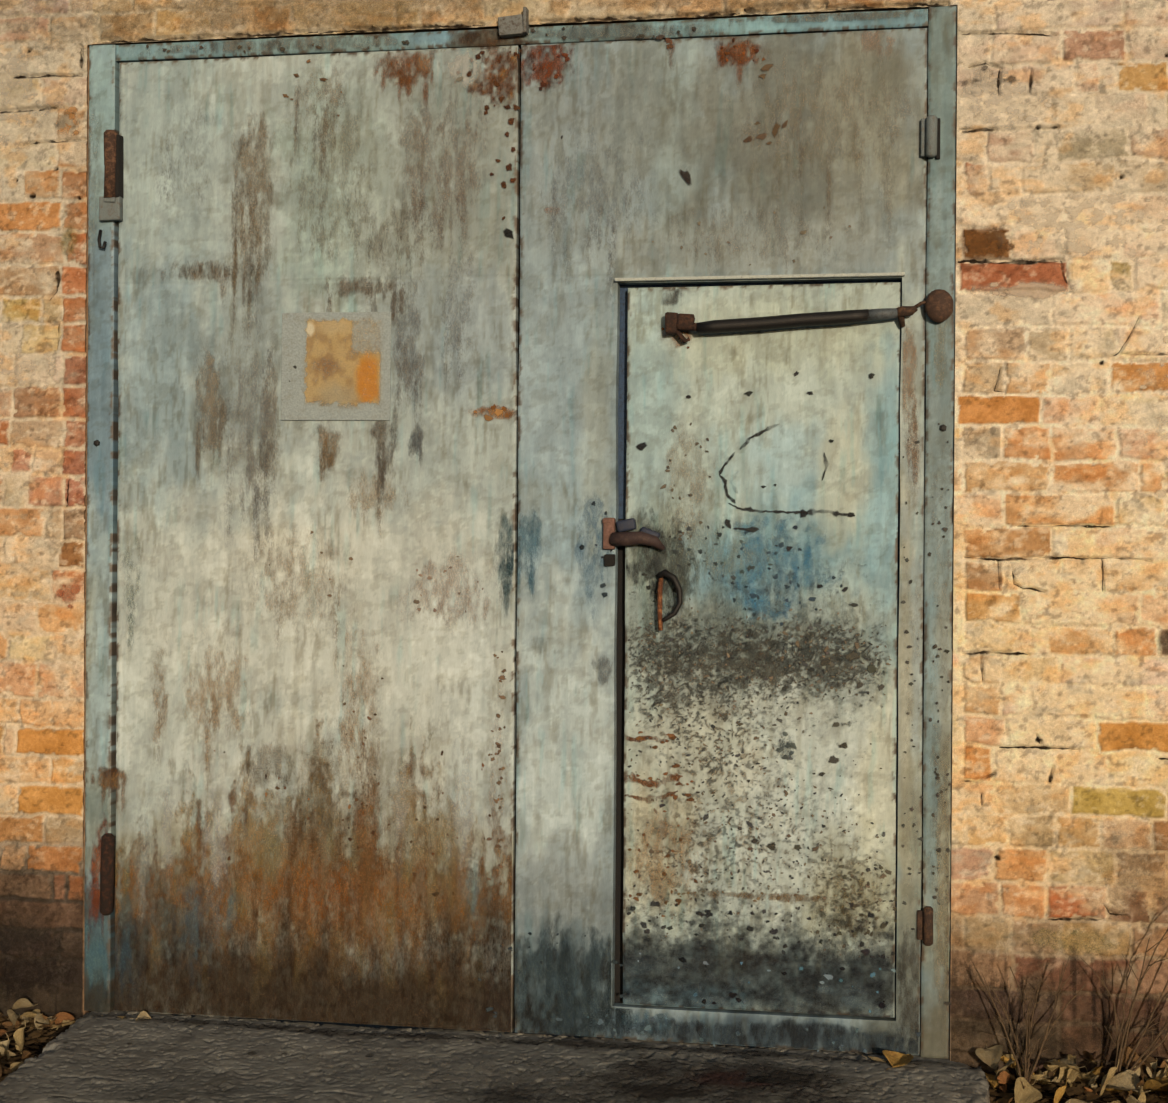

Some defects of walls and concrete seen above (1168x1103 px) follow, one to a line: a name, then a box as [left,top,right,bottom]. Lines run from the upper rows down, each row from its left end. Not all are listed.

rust [376,52,433,99]
rust [459,31,572,188]
rust [717,38,765,79]
rust [474,404,513,421]
damp [0,872,108,1020]
rust [88,724,512,1032]
damp [500,894,921,1055]
damp [951,959,1168,1078]